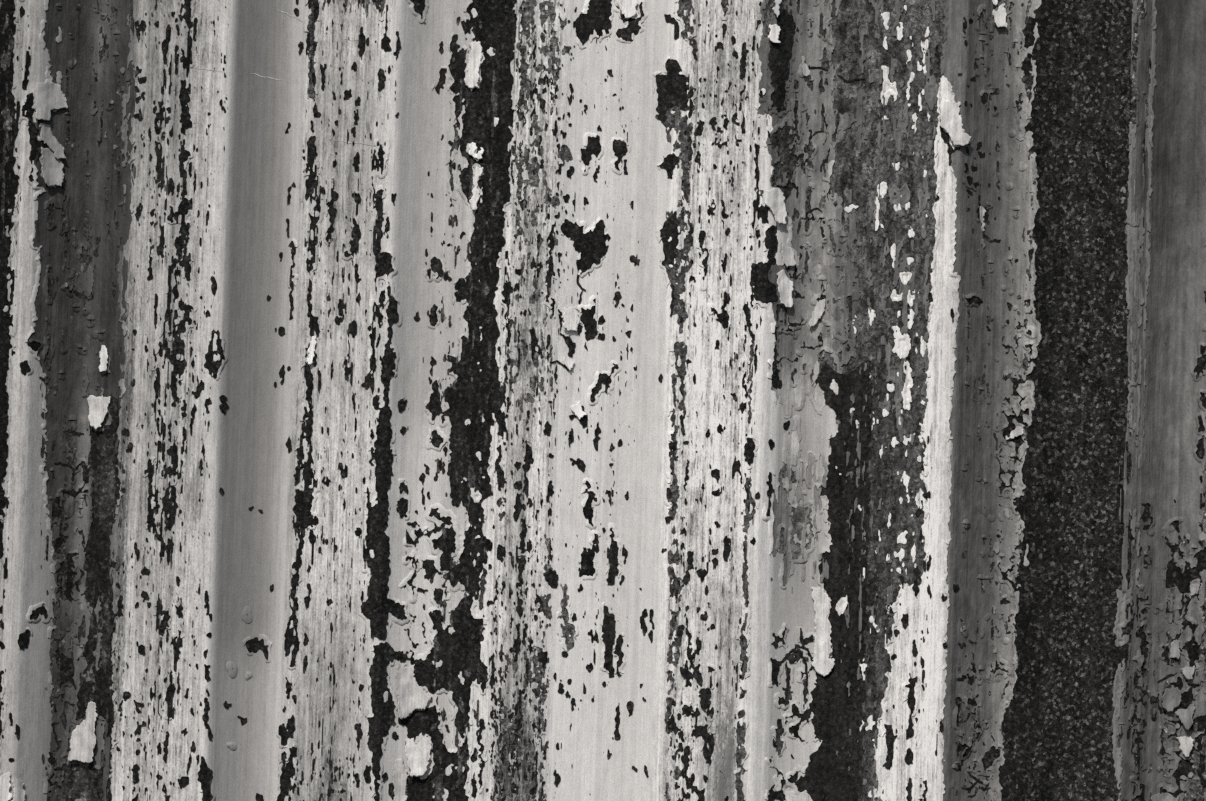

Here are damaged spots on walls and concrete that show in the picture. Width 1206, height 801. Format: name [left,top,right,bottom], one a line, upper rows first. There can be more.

peeling [617,0,638,18]
peeling [456,41,483,102]
peeling [468,142,484,210]
peeling [550,306,579,331]
peeling [752,0,899,590]
peeling [894,264,934,391]
peeling [13,0,141,801]
peeling [921,0,1042,801]
peeling [1116,0,1206,801]
peeling [791,581,834,676]
peeling [395,662,430,726]
peeling [392,737,431,801]